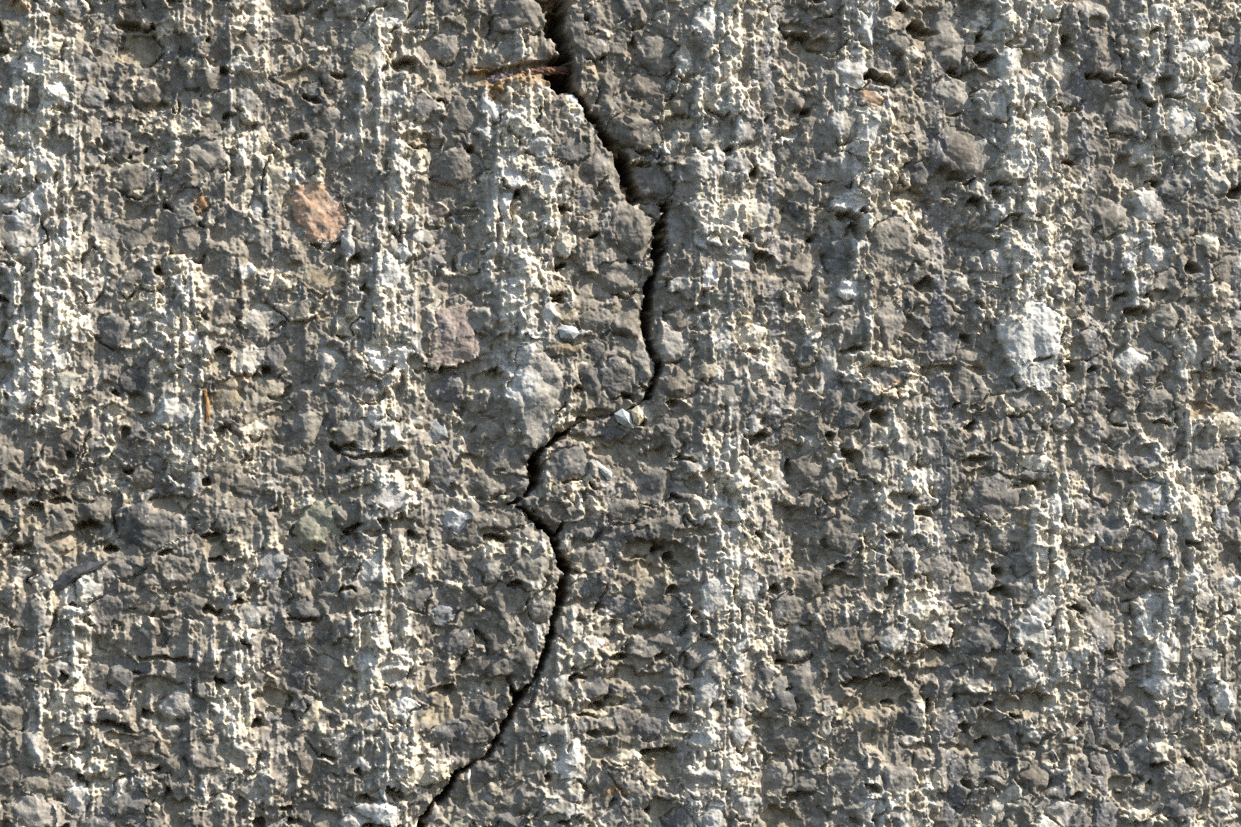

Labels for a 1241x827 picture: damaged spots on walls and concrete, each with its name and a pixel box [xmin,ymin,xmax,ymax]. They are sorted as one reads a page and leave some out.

crack [343,452,403,460]
crack [416,0,674,827]